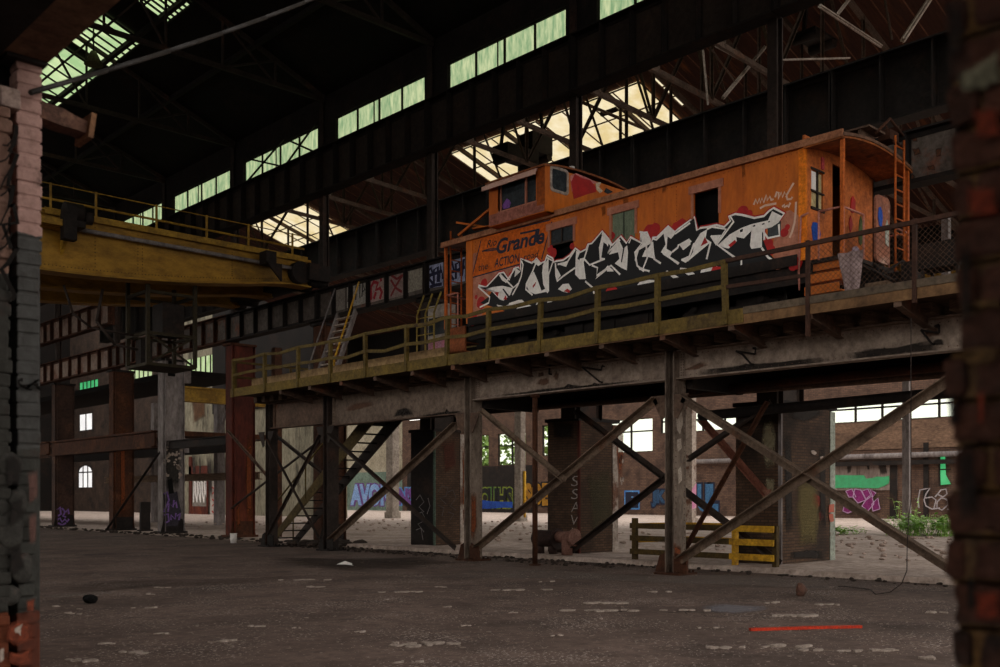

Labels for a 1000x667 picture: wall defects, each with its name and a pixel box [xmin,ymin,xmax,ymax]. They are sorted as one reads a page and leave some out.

water stain [854,339,943,359]
water stain [706,359,819,374]
peeling [0,599,34,665]